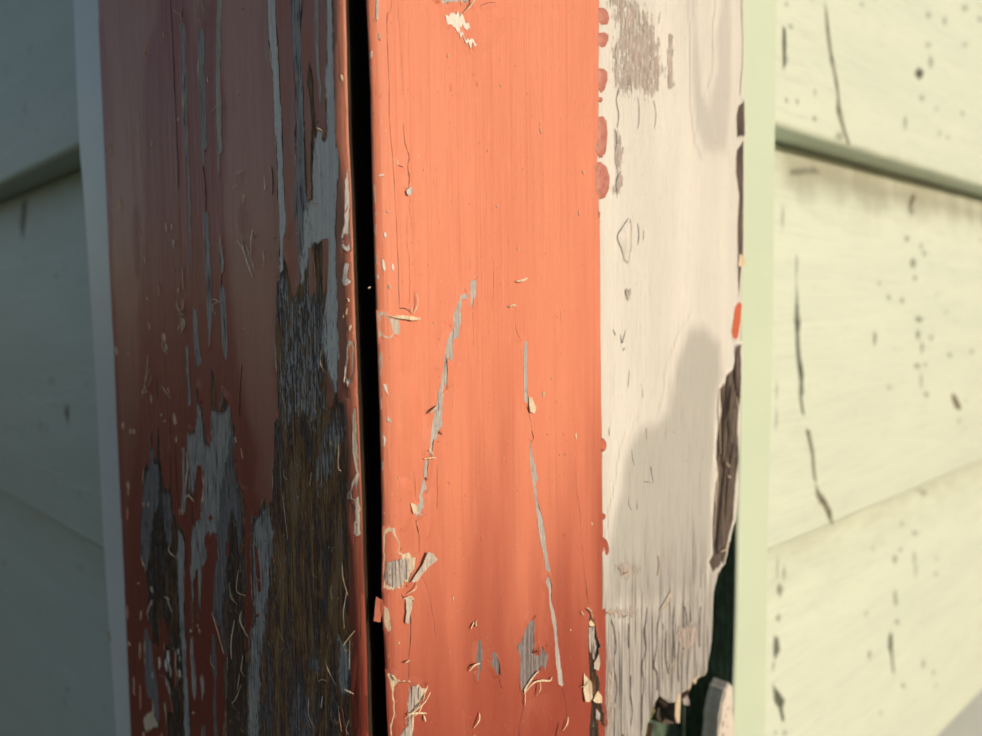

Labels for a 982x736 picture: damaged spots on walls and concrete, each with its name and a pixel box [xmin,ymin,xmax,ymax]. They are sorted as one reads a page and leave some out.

peeling [432,0,504,58]
peeling [730,0,746,342]
peeling [128,0,369,736]
peeling [373,260,479,736]
peeling [469,620,503,693]
peeling [510,308,571,731]
peeling [581,608,608,736]
peeling [702,677,734,736]